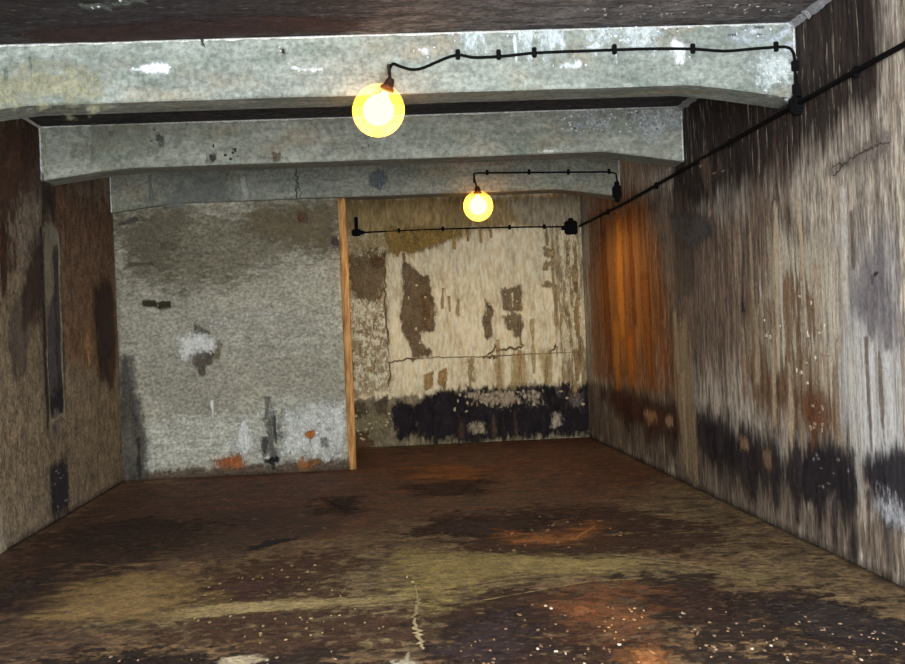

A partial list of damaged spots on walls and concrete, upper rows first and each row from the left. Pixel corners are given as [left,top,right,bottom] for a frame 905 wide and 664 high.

leakage [0,119,66,435]
leakage [81,274,148,481]
peeling [276,229,394,471]
spalling [400,253,460,361]
spalling [424,368,447,390]
crack [377,250,586,388]
spalling [482,285,526,345]
leakage [666,310,734,487]
leakage [851,234,903,350]
leakage [815,482,857,559]
leakage [865,489,890,563]